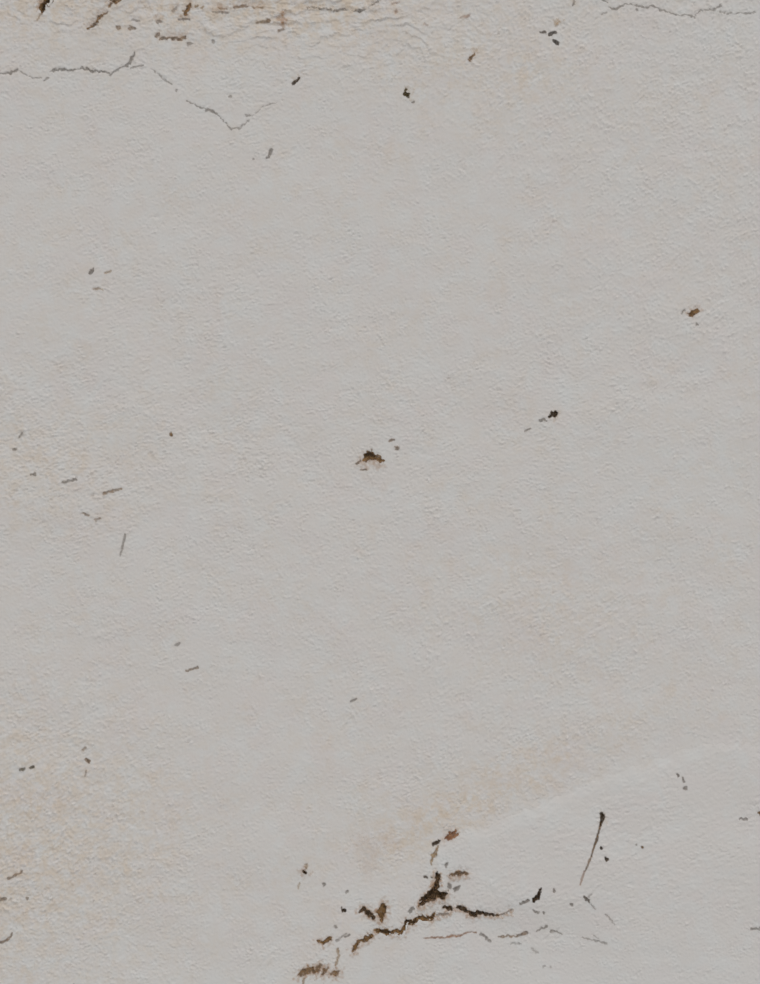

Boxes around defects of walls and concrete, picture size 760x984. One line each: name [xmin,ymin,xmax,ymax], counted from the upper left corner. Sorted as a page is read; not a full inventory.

crack [87,0,121,29]
flaking render [356,449,385,470]
crack [520,888,542,905]
crack [352,905,528,952]